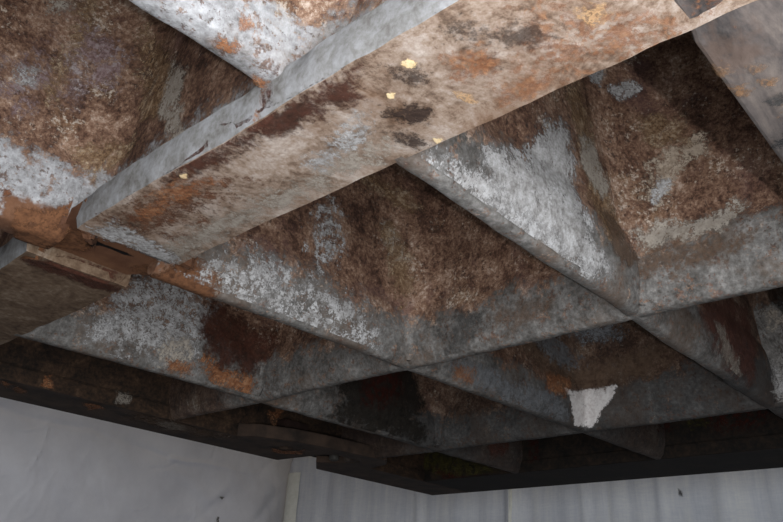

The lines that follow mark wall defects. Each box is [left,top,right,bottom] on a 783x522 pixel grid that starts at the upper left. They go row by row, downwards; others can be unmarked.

rust [11,201,121,293]
rust [131,256,223,299]
damp [198,301,279,378]
spalling [564,384,618,428]